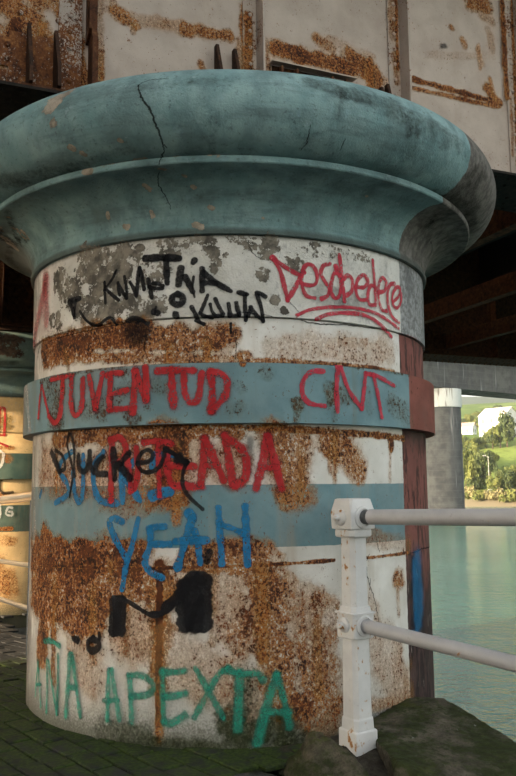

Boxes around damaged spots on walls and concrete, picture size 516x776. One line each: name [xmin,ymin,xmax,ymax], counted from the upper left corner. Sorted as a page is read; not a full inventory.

rust [0,0,59,39]
rust [98,0,253,70]
rust [265,0,400,89]
rust [412,0,516,156]
crack [137,78,171,210]
peeling [49,222,370,334]
rust [39,315,409,526]
rust [0,526,18,598]
rust [393,569,404,591]
rust [29,522,343,744]
rust [369,637,411,711]